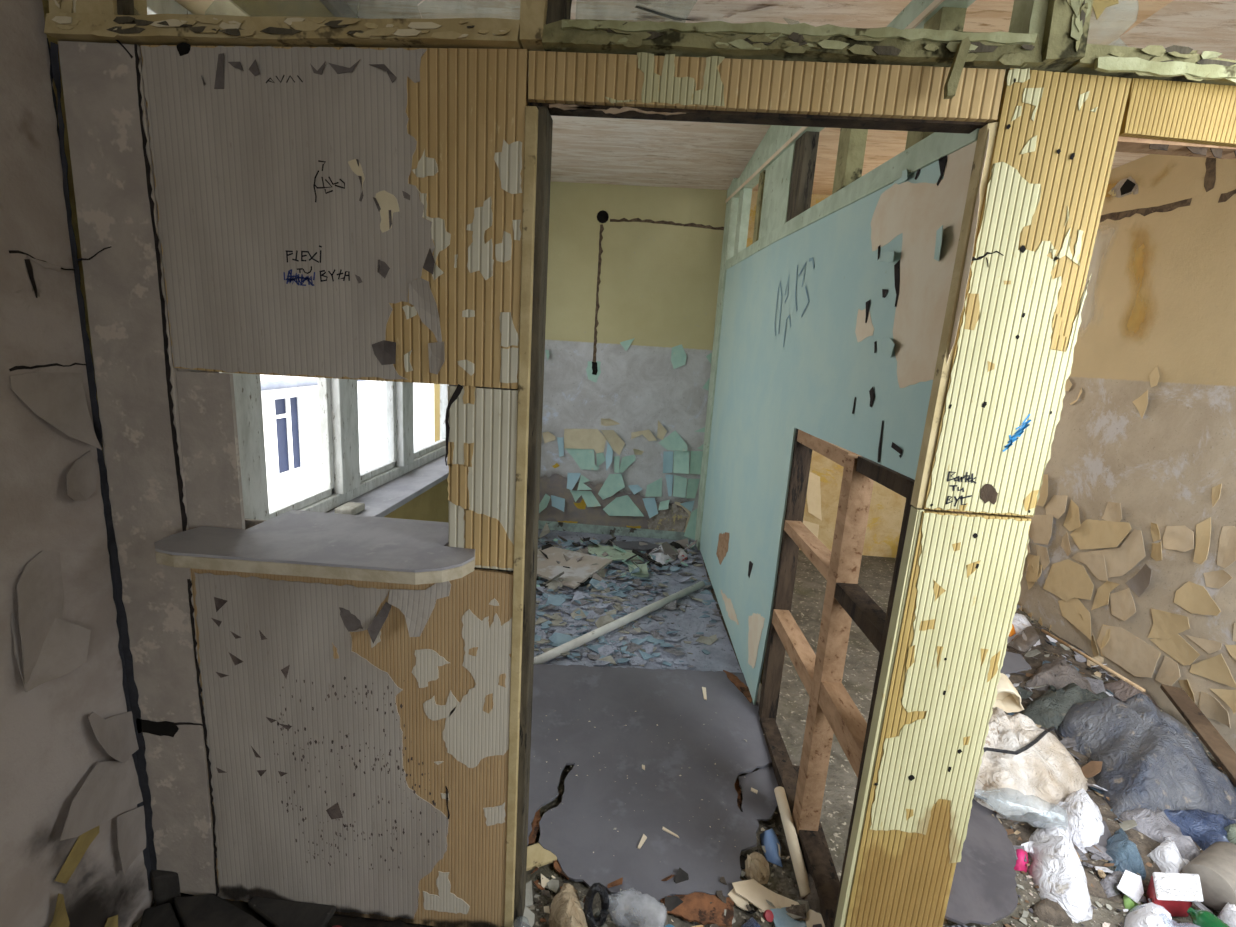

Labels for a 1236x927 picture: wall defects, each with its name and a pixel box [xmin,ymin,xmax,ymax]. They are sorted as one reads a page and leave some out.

peeling [1135,45,1236,83]
peeling [90,15,511,380]
crack [9,38,219,896]
peeling [539,418,705,540]
spalling [716,532,729,565]
spalling [721,590,765,668]
peeling [1025,474,1236,728]
peeling [1133,366,1160,418]
peeling [49,711,146,927]
peeling [194,573,451,919]